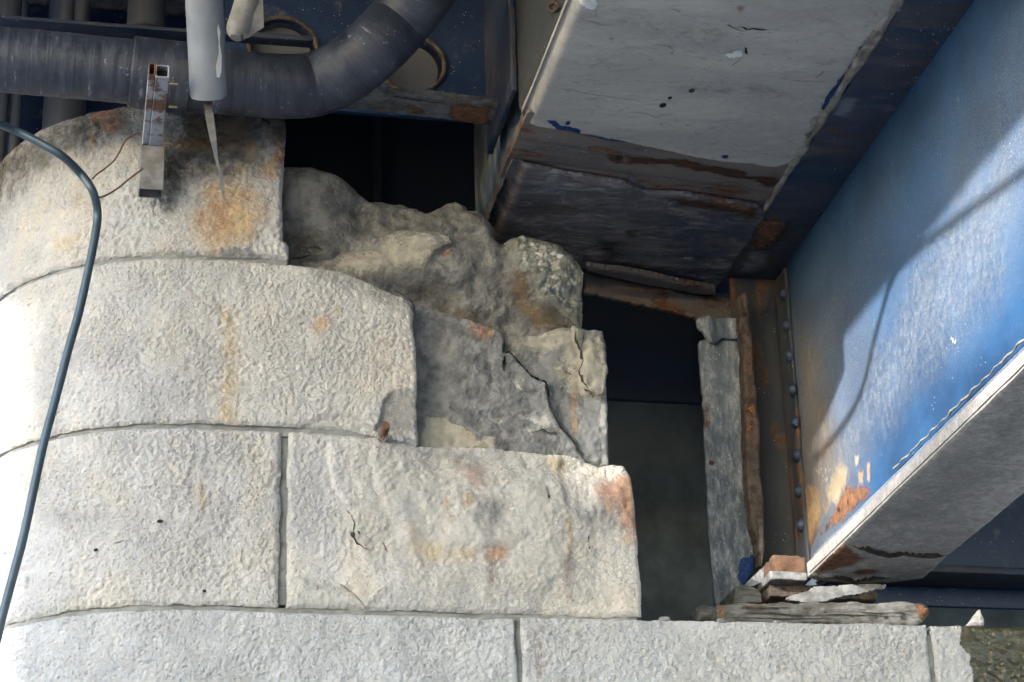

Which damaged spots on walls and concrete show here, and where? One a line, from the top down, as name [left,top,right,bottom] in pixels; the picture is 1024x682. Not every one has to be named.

corrosion [449,104,490,124]
peeling [547,120,631,144]
crack [574,329,593,397]
crack [504,341,578,446]
corrosion [734,292,765,571]
crack [345,507,387,551]
corrosion [598,480,634,535]
corrosion [807,465,869,546]
corrosion [818,544,877,574]